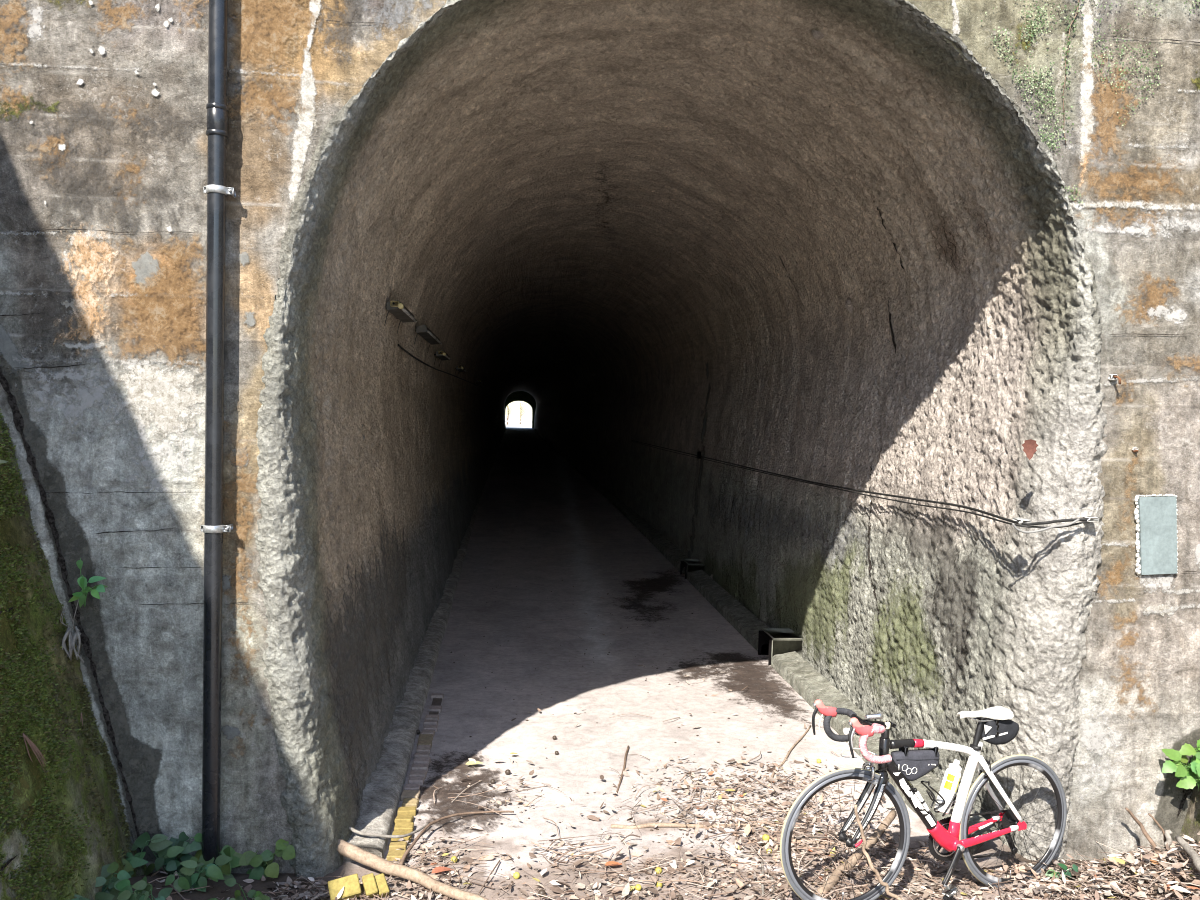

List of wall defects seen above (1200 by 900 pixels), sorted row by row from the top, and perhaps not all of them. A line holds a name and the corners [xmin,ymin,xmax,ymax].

corrosion [0,0,30,119]
corrosion [227,0,316,135]
damp [288,0,321,204]
damp [1079,0,1099,187]
corrosion [1075,52,1183,235]
corrosion [54,226,206,371]
damp [324,517,412,801]